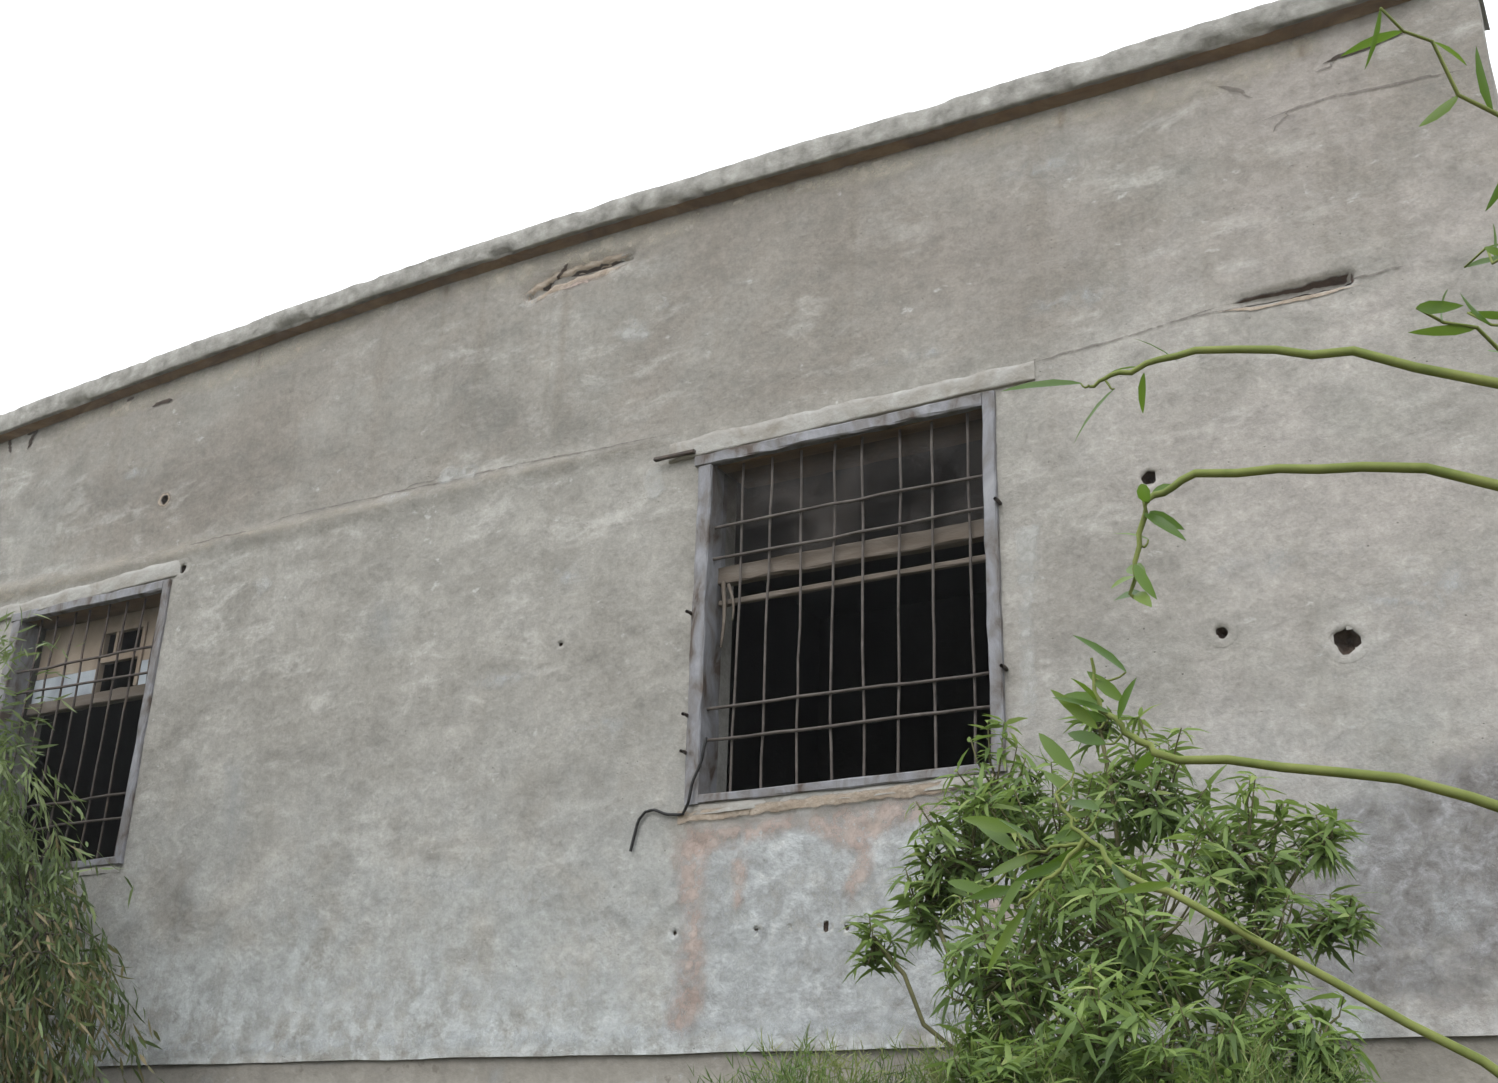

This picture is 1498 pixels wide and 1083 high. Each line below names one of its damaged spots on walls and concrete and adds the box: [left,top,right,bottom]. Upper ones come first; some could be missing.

crack [1221,33,1455,130]
spalling [524,253,631,306]
spalling [1220,273,1362,312]
crack [1043,306,1247,360]
spalling [1321,617,1371,663]